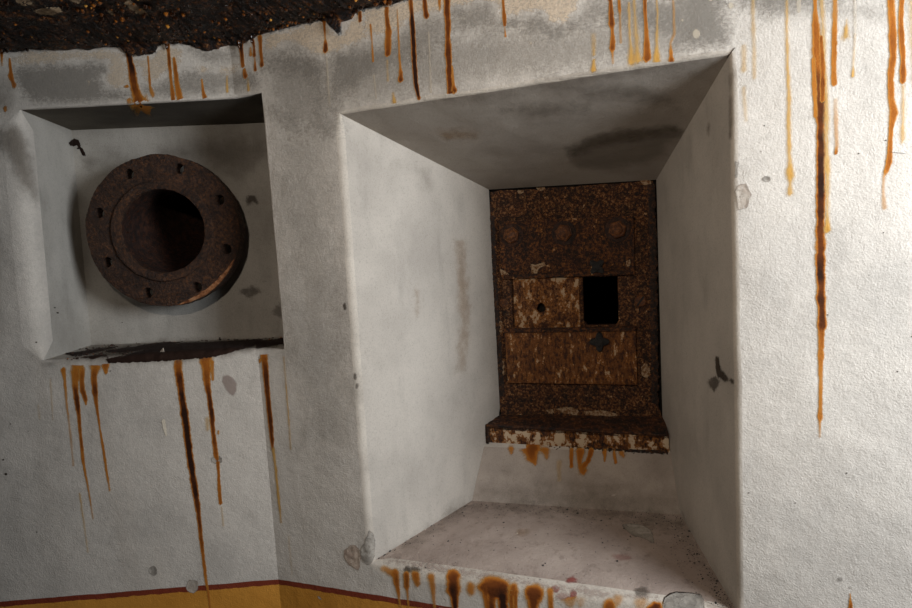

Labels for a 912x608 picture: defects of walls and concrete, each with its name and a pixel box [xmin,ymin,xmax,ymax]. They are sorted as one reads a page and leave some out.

rust [0,0,457,115]
rust [608,0,674,65]
rust [786,11,794,195]
rust [883,0,907,181]
rust [811,0,848,433]
rust [61,337,284,608]
flaking render [344,531,375,570]
rust [382,567,436,608]
rust [446,569,554,608]
flaking render [662,591,725,608]